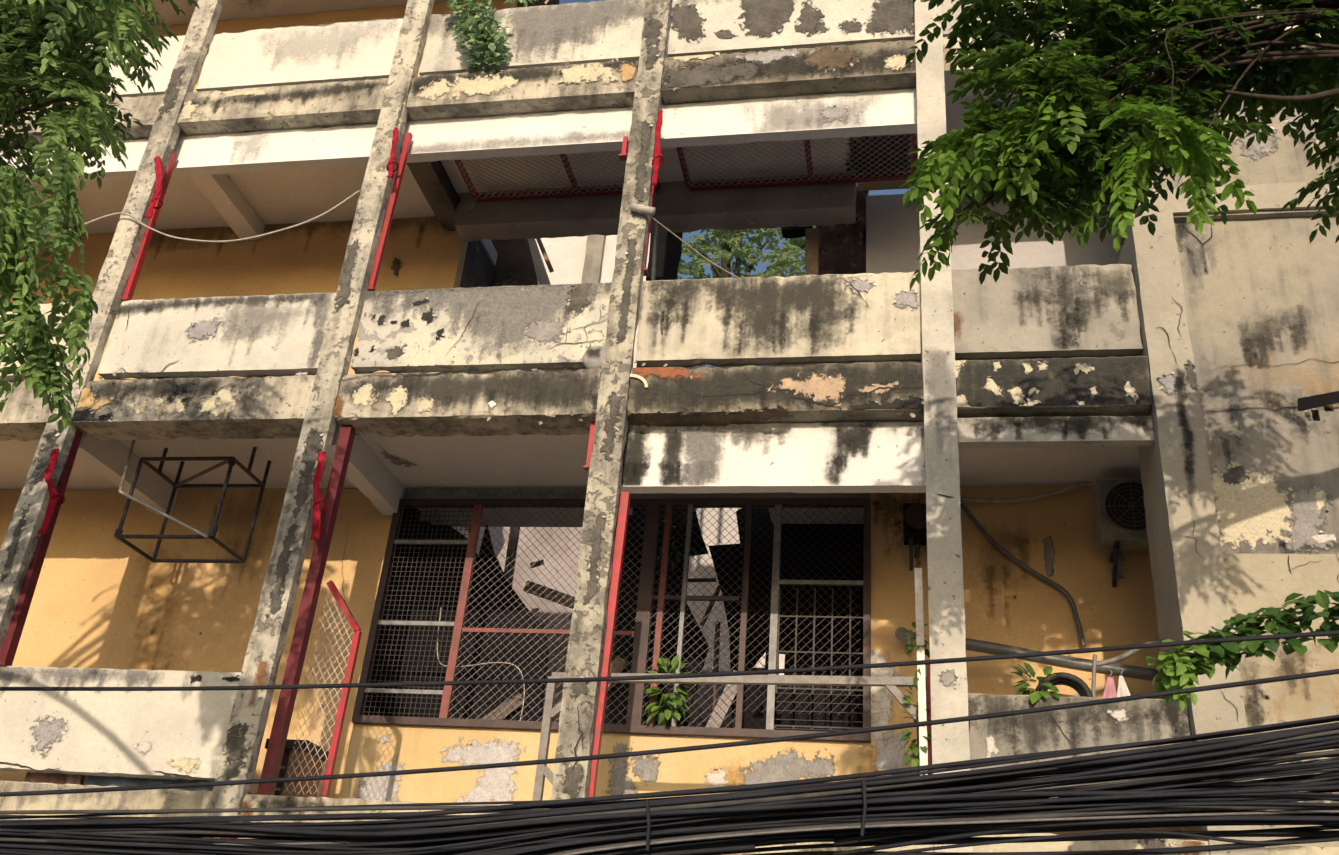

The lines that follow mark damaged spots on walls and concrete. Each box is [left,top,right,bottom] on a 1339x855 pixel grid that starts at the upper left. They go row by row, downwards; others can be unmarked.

peeling [132,385,240,418]
peeling [352,384,434,416]
spalling [538,372,924,461]
leakage [629,274,924,412]
peeling [982,361,1048,406]
leakage [956,272,1154,440]
leakage [621,427,755,485]
leakage [824,422,875,482]
peeling [1211,460,1339,553]
peeling [354,732,406,802]
peeling [434,735,526,805]
peeling [704,746,842,788]